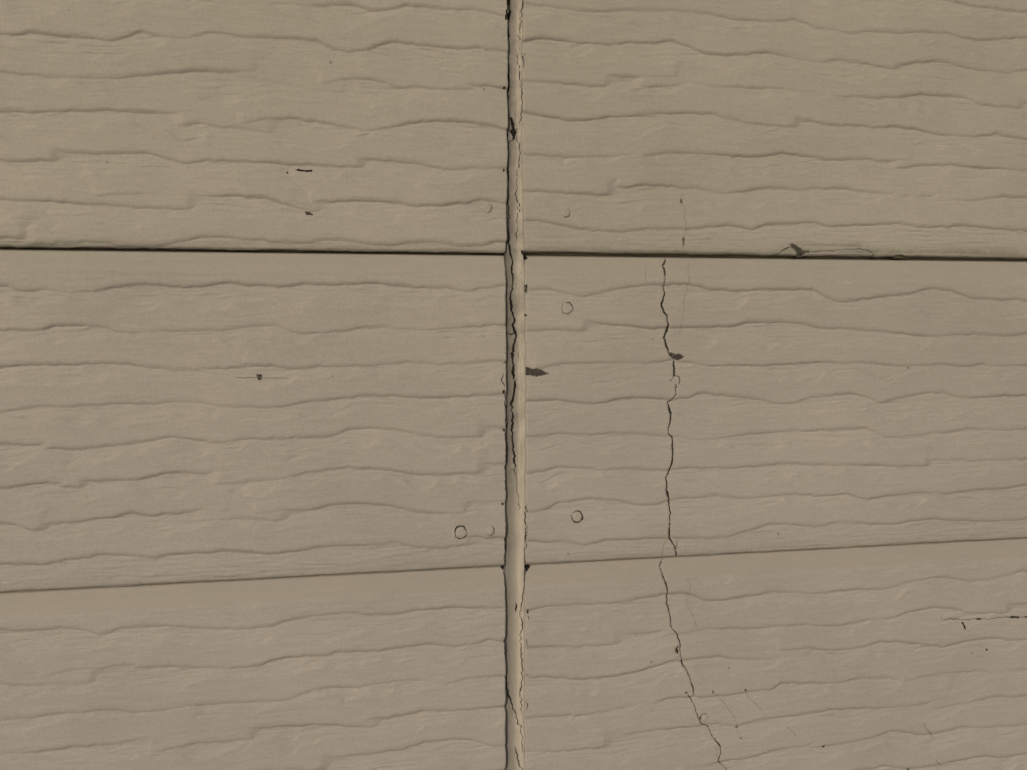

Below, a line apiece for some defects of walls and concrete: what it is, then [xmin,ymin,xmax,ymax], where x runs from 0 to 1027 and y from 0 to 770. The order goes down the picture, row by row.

crack [488,0,525,239]
crack [501,272,529,770]
crack [645,193,763,770]